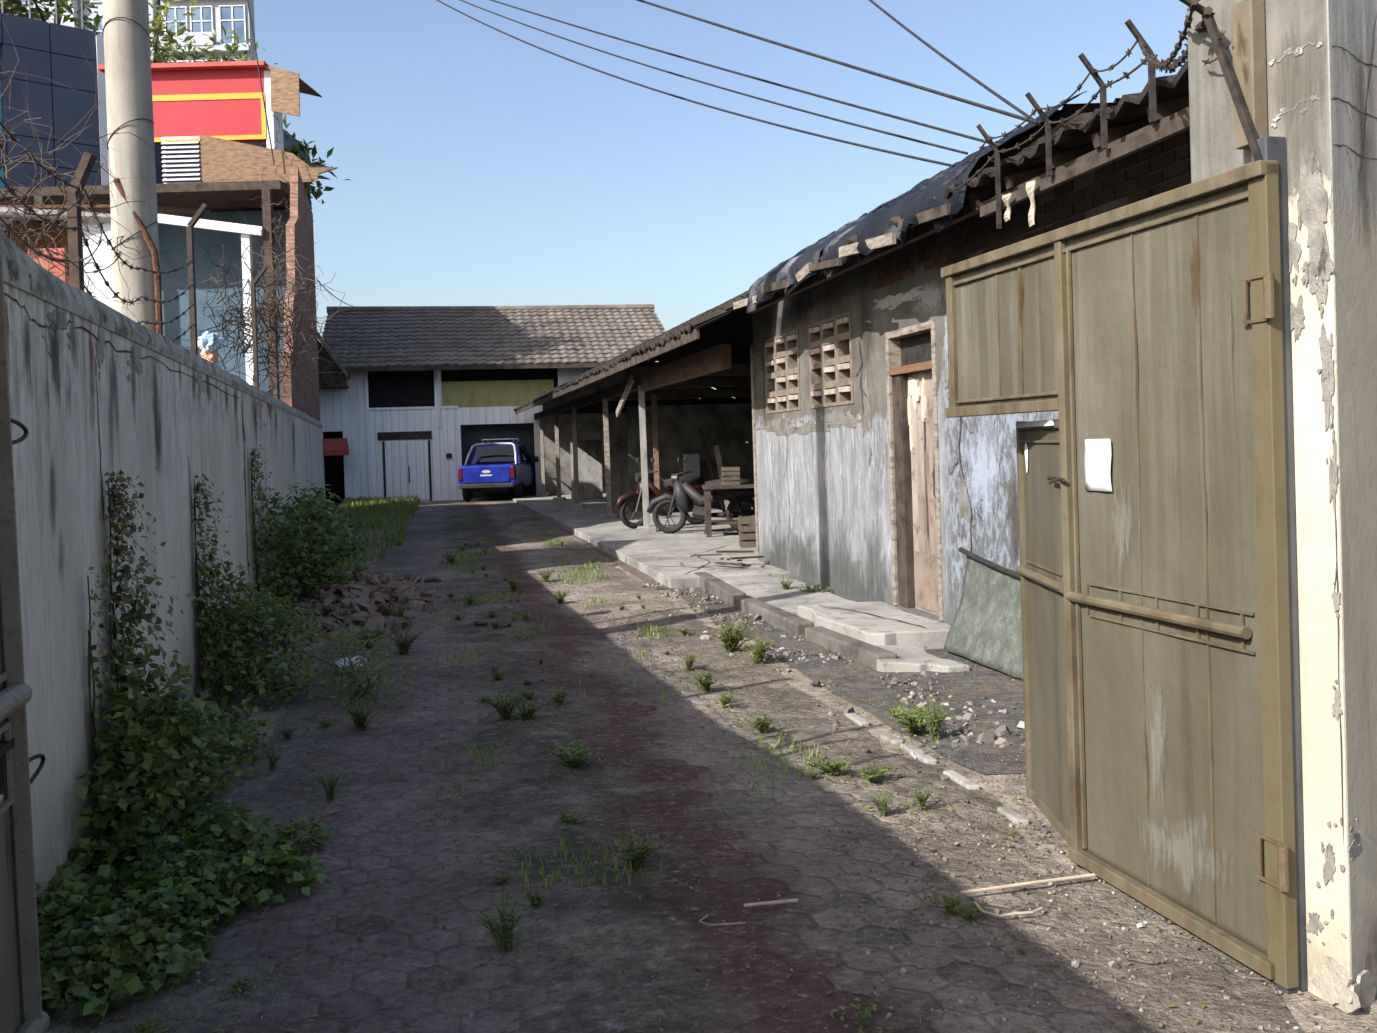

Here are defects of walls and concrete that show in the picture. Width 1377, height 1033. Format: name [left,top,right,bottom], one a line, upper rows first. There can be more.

crack [1331,15,1377,179]
water stain [27,313,76,411]
water stain [111,352,136,456]
water stain [154,370,162,465]
water stain [179,362,257,444]
peeling [1288,143,1338,515]
water stain [1007,476,1019,567]
peeling [1316,817,1363,888]
spalling [1306,909,1376,1013]